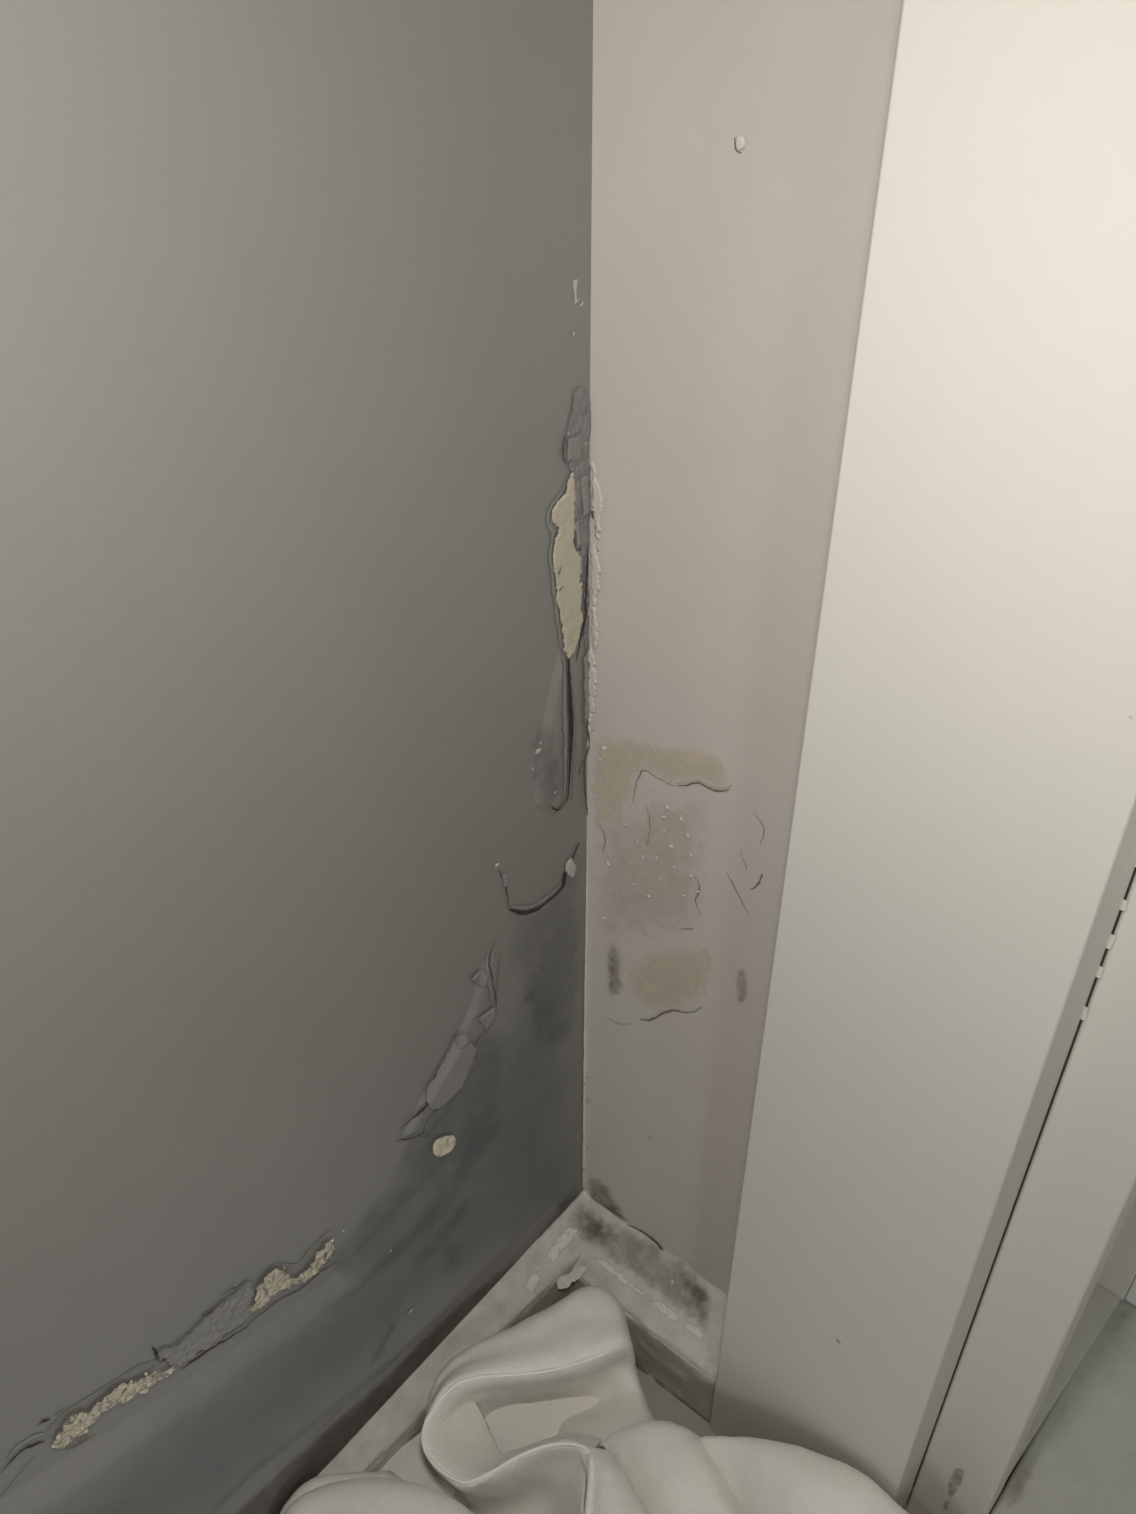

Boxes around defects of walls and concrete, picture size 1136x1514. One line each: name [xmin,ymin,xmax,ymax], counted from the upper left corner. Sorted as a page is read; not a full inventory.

spalling [547,387,607,761]
peeling [430,1131,456,1157]
peeling [426,1034,477,1110]
peeling [576,873,605,1191]
peeling [45,1230,344,1450]